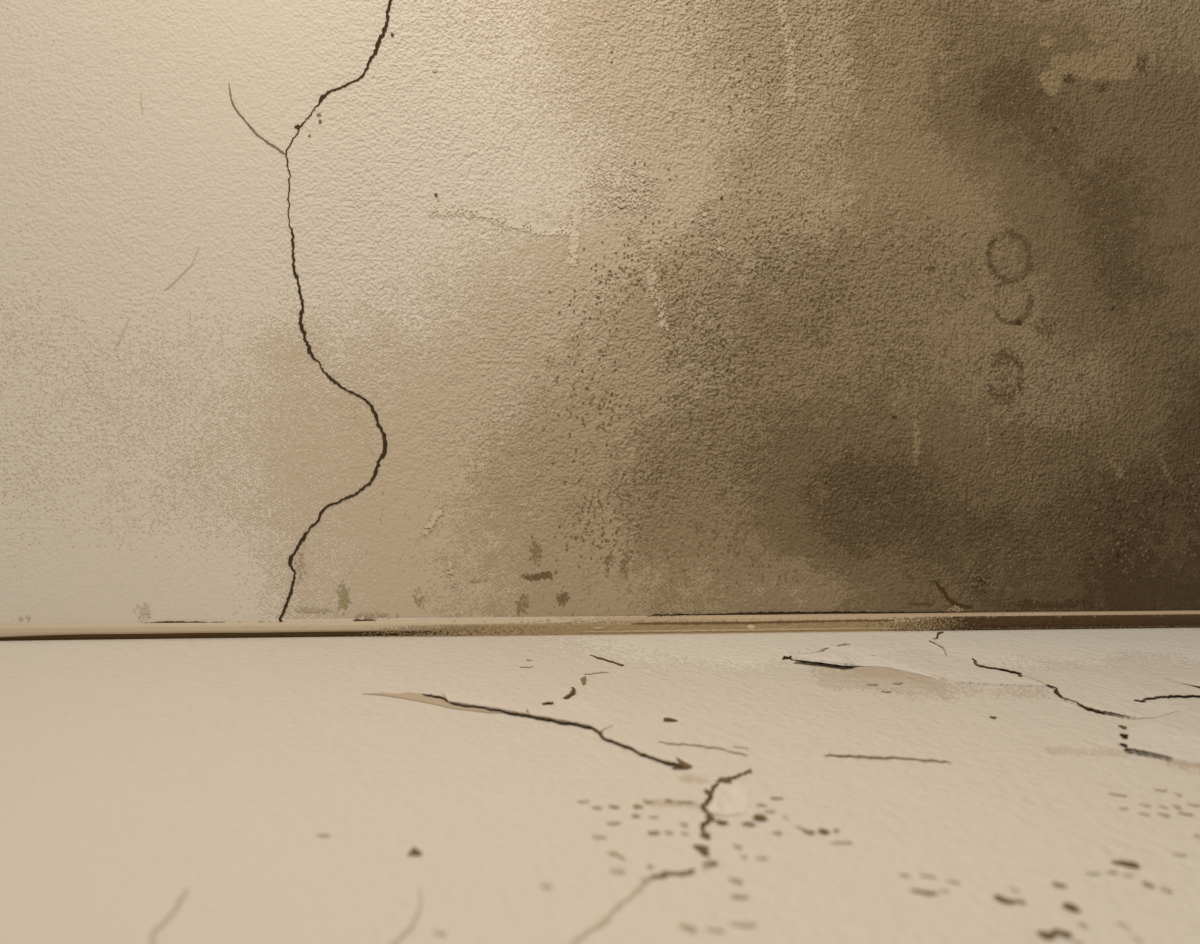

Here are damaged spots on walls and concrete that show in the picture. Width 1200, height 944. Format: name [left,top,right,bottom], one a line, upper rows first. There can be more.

crack [229,0,392,622]
water stain [0,0,1200,638]
crack [150,618,221,626]
crack [631,580,1200,717]
spalling [367,692,504,713]
crack [424,655,752,832]
spalling [671,758,692,769]
crack [148,888,187,944]
crack [570,869,695,944]